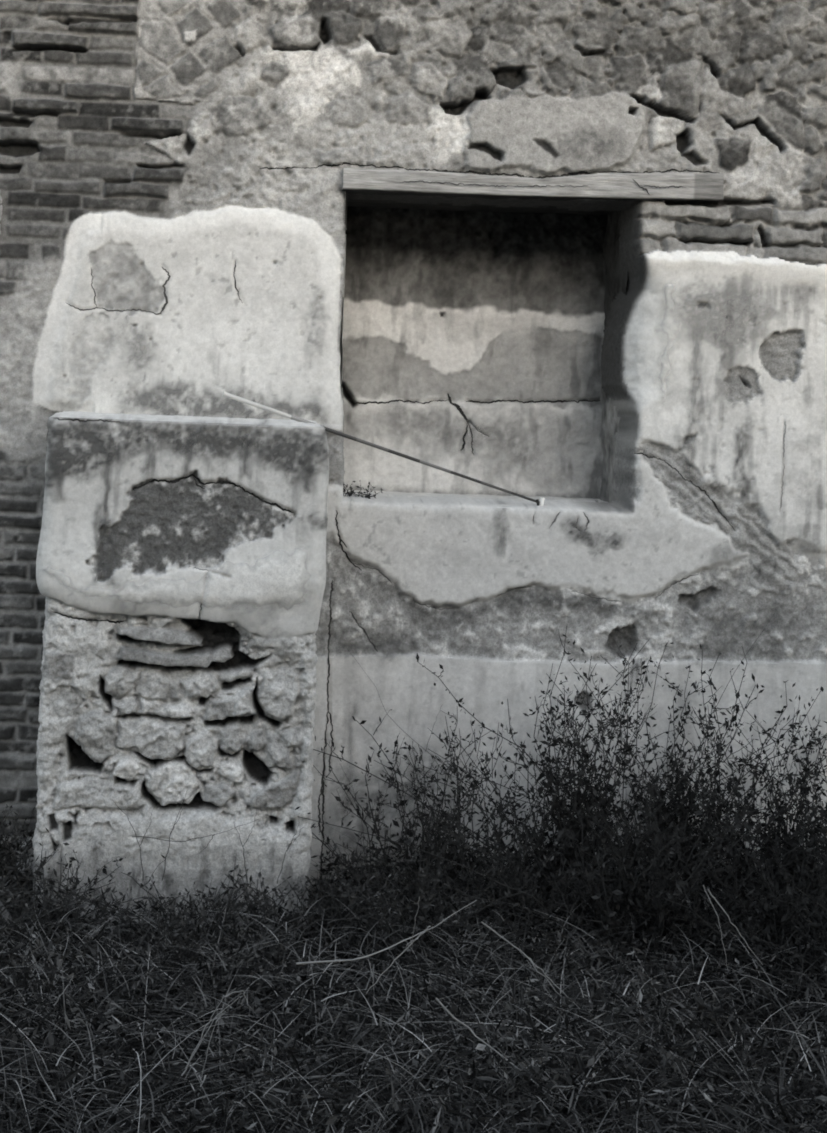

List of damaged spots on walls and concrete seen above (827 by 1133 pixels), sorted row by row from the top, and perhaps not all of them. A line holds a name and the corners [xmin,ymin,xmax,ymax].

peeling [61,240,166,412]
crack [354,394,600,454]
spalling [723,330,806,405]
spalling [41,432,827,840]